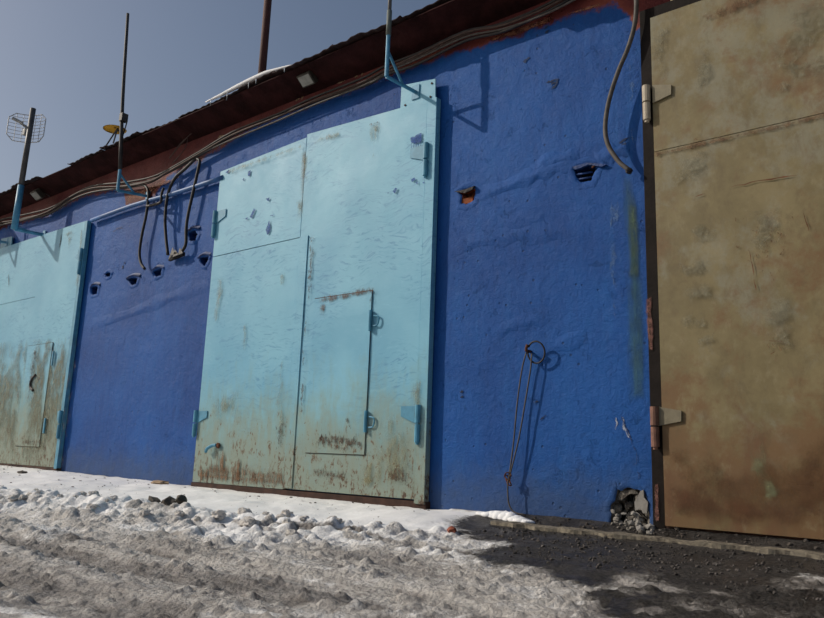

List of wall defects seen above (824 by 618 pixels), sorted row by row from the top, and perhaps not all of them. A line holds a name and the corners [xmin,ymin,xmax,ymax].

rust [318,432,361,452]
rust [200,452,282,483]
flaking render [604,480,653,525]